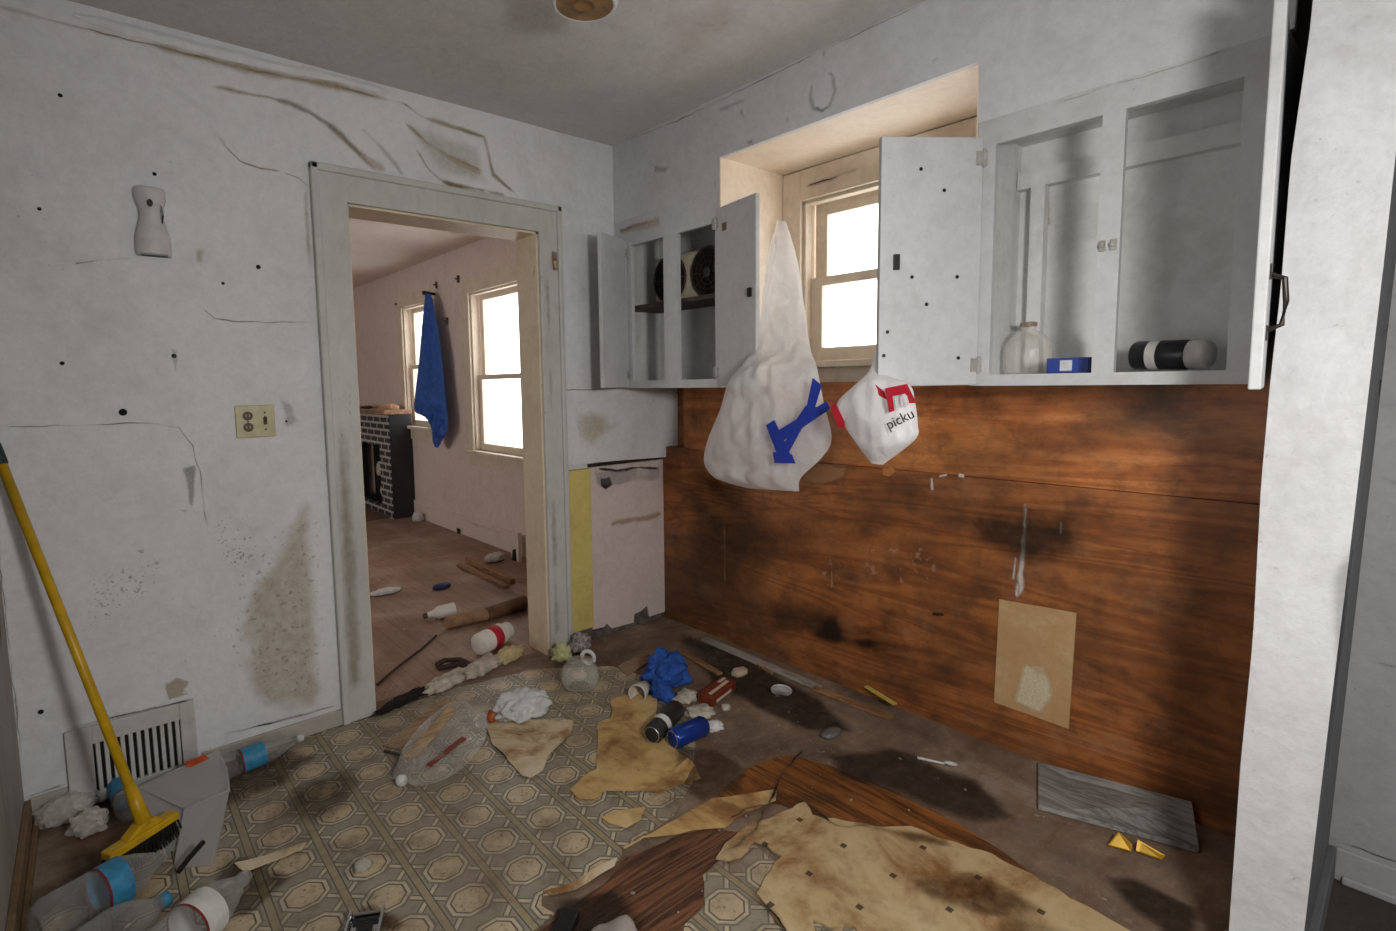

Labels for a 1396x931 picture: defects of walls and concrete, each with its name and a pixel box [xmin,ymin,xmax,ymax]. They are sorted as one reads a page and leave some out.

crack [70,0,511,190]
damp [1013,553,1025,597]